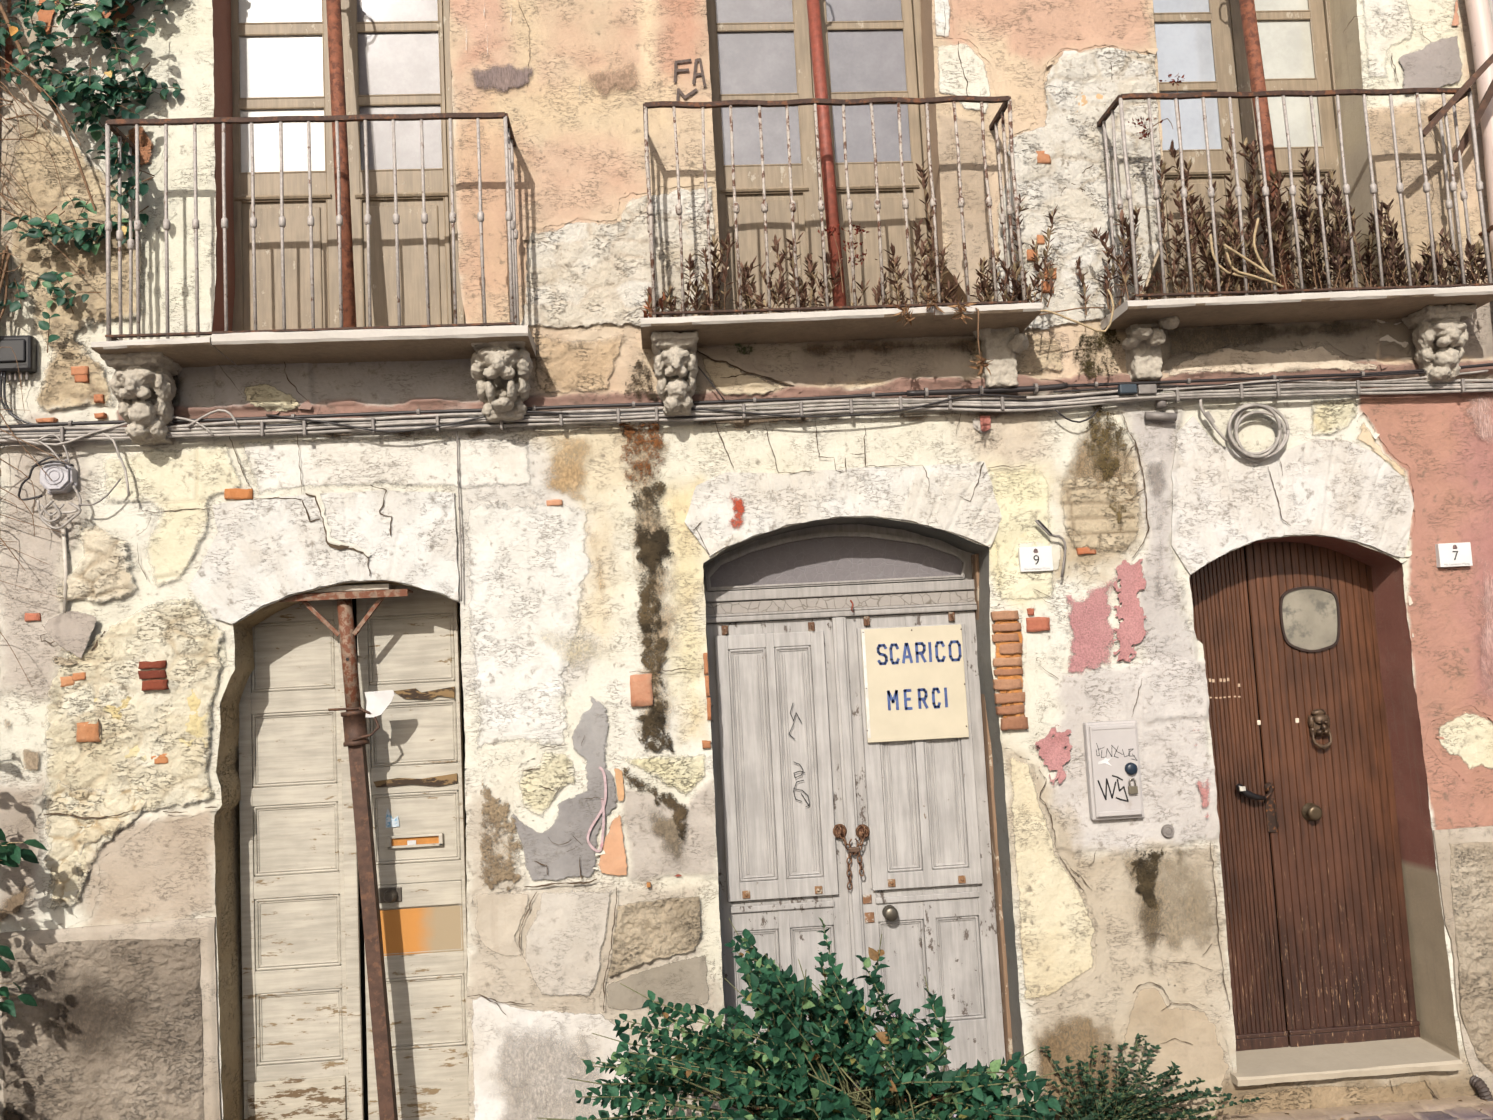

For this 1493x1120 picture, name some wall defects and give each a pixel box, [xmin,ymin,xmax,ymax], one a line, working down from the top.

peeling [507,171,729,394]
peeling [934,0,1163,386]
crack [229,362,392,576]
damp [549,423,612,499]
flaking render [24,613,41,621]
flaking render [39,672,86,723]
flaking render [76,660,169,742]
flaking render [104,436,592,833]
damp [629,432,674,752]
spalling [990,471,1140,1014]
peeling [1425,704,1493,783]